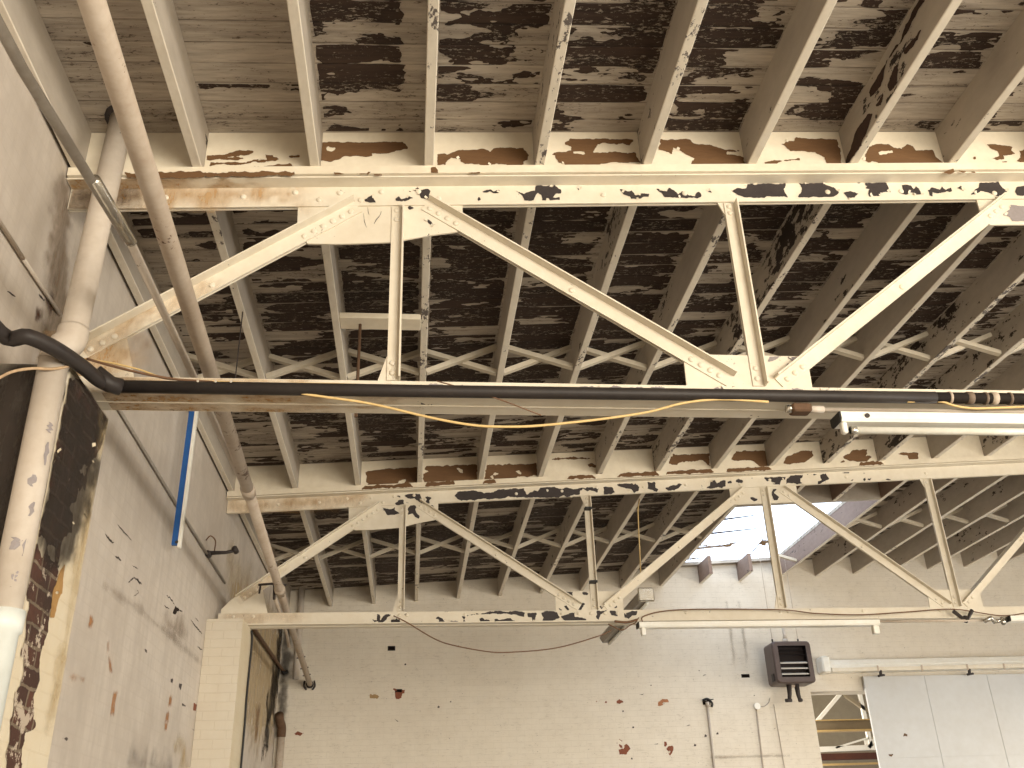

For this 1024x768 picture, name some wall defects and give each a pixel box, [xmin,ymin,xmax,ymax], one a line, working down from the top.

peeling [551,0,676,165]
peeling [658,0,785,164]
corrosion [70,179,91,208]
corrosion [117,183,140,205]
peeling [339,219,508,385]
peeling [463,185,612,284]
peeling [732,0,1024,390]
water stain [0,364,37,545]
water stain [36,375,105,566]
peeling [262,412,829,590]
peeling [6,502,65,768]
water stain [247,629,292,760]